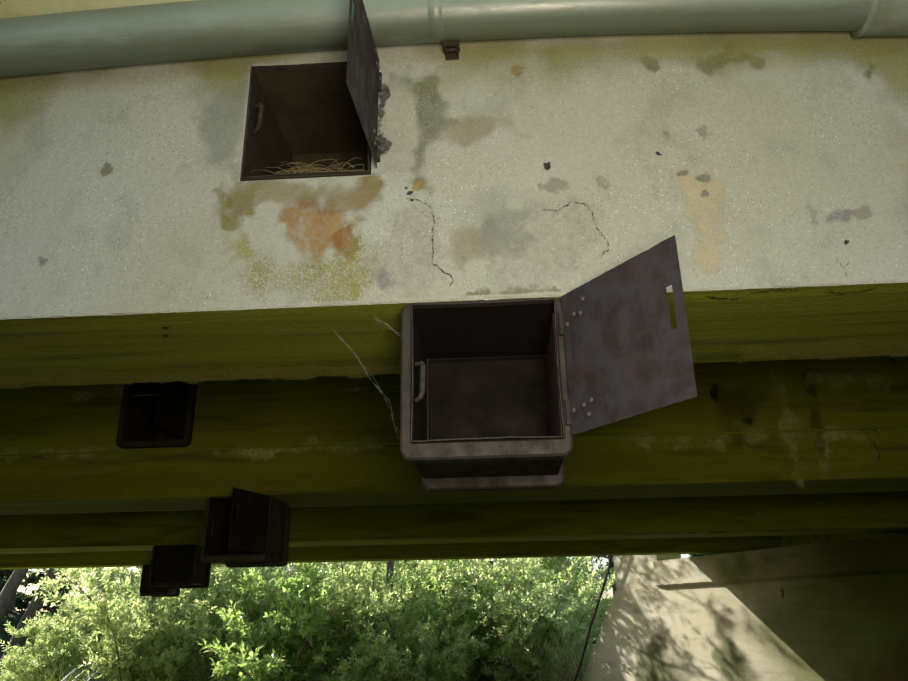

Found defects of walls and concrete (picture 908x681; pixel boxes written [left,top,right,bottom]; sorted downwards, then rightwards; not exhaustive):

corrosion [280,198,358,257]
crack [408,198,453,287]